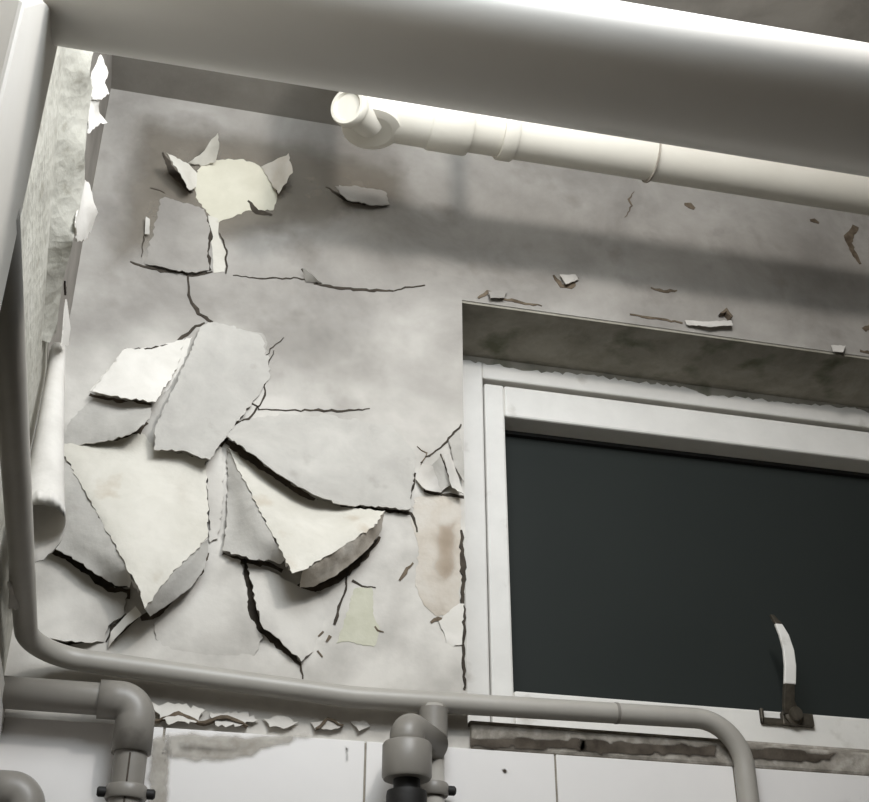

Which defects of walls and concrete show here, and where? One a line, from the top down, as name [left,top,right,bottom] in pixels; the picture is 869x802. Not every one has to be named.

crack [130,261,425,322]
peeling [30,47,467,689]
peeling [152,702,298,729]
peeling [311,717,370,731]